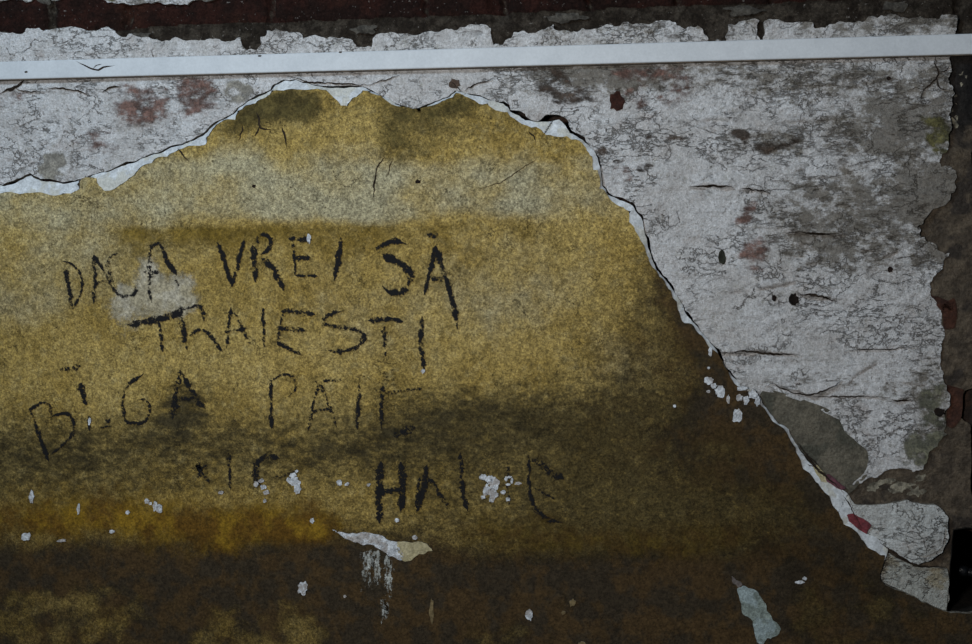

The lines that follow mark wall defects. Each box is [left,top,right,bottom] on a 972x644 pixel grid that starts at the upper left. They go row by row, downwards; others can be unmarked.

flaking render [0,0,972,62]
leakage [224,80,320,130]
leakage [382,97,469,159]
leakage [38,152,66,180]
leakage [122,226,298,253]
peeling [0,57,957,485]
flaking render [847,115,972,575]
leakage [0,264,972,644]
peeling [479,474,522,502]
peeling [759,390,949,610]
peeling [333,529,432,624]
peeling [732,576,781,644]